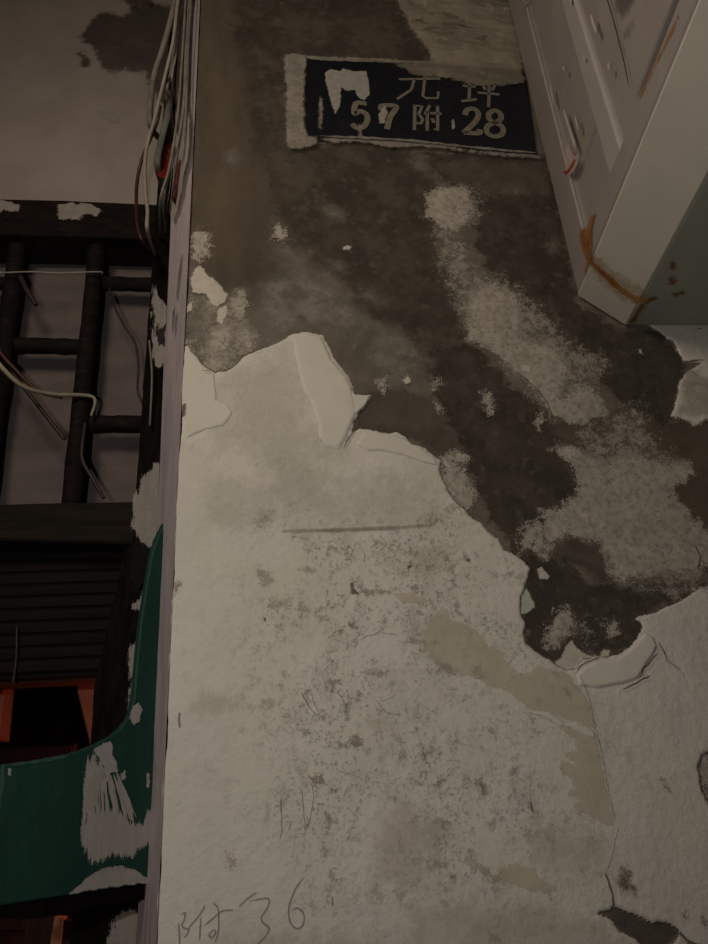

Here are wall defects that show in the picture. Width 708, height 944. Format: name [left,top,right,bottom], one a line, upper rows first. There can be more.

leakage [77,0,170,103]
peeling [0,199,20,212]
peeling [57,202,100,220]
rust [579,213,657,326]
leakage [185,0,708,661]
peeling [150,16,708,825]
peeling [129,462,159,610]
crack [622,643,680,690]
crack [577,657,619,906]
peeling [598,906,693,944]